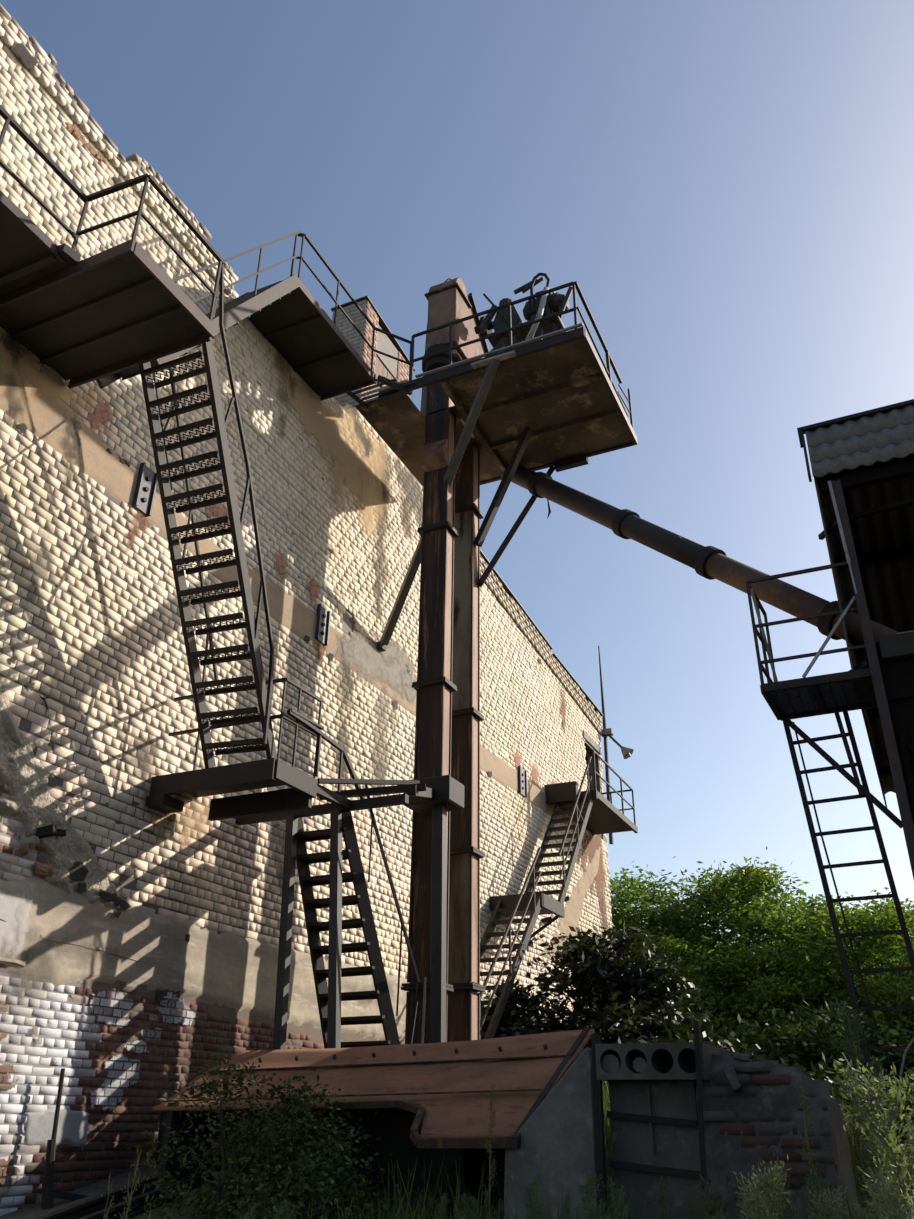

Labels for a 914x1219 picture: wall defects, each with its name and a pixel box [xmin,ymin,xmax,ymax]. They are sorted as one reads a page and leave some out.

damp [0,336,70,425]
damp [65,423,80,484]
damp [287,377,423,617]
damp [339,668,354,786]
peeling [78,883,121,918]
peeling [124,1027,162,1053]
peeling [0,1064,18,1090]
peeling [92,1093,116,1111]
peeling [0,1158,20,1185]